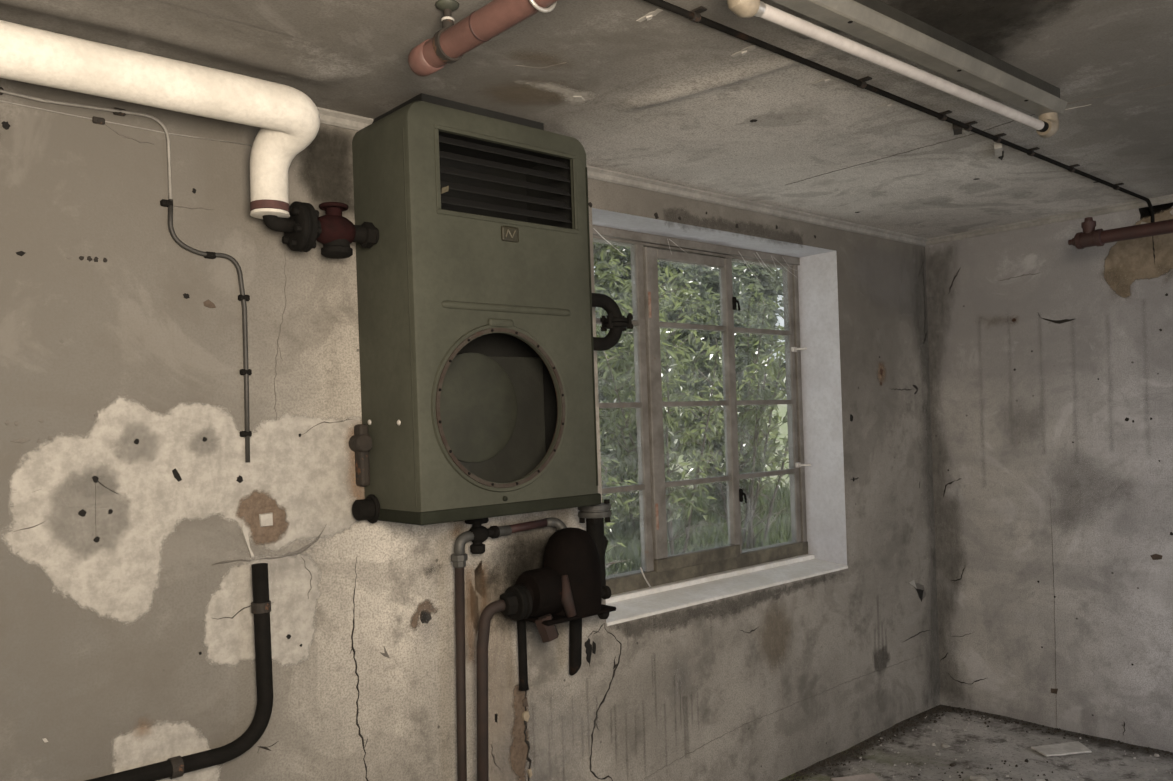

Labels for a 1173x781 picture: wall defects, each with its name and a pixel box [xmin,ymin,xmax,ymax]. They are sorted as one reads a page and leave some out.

peeling [1104,202,1173,298]
peeling [1,396,365,666]
peeling [113,721,211,773]
peeling [157,765,220,781]
crack [350,559,390,781]
flaking render [509,684,533,781]
crack [589,623,622,781]
crack [641,630,986,781]